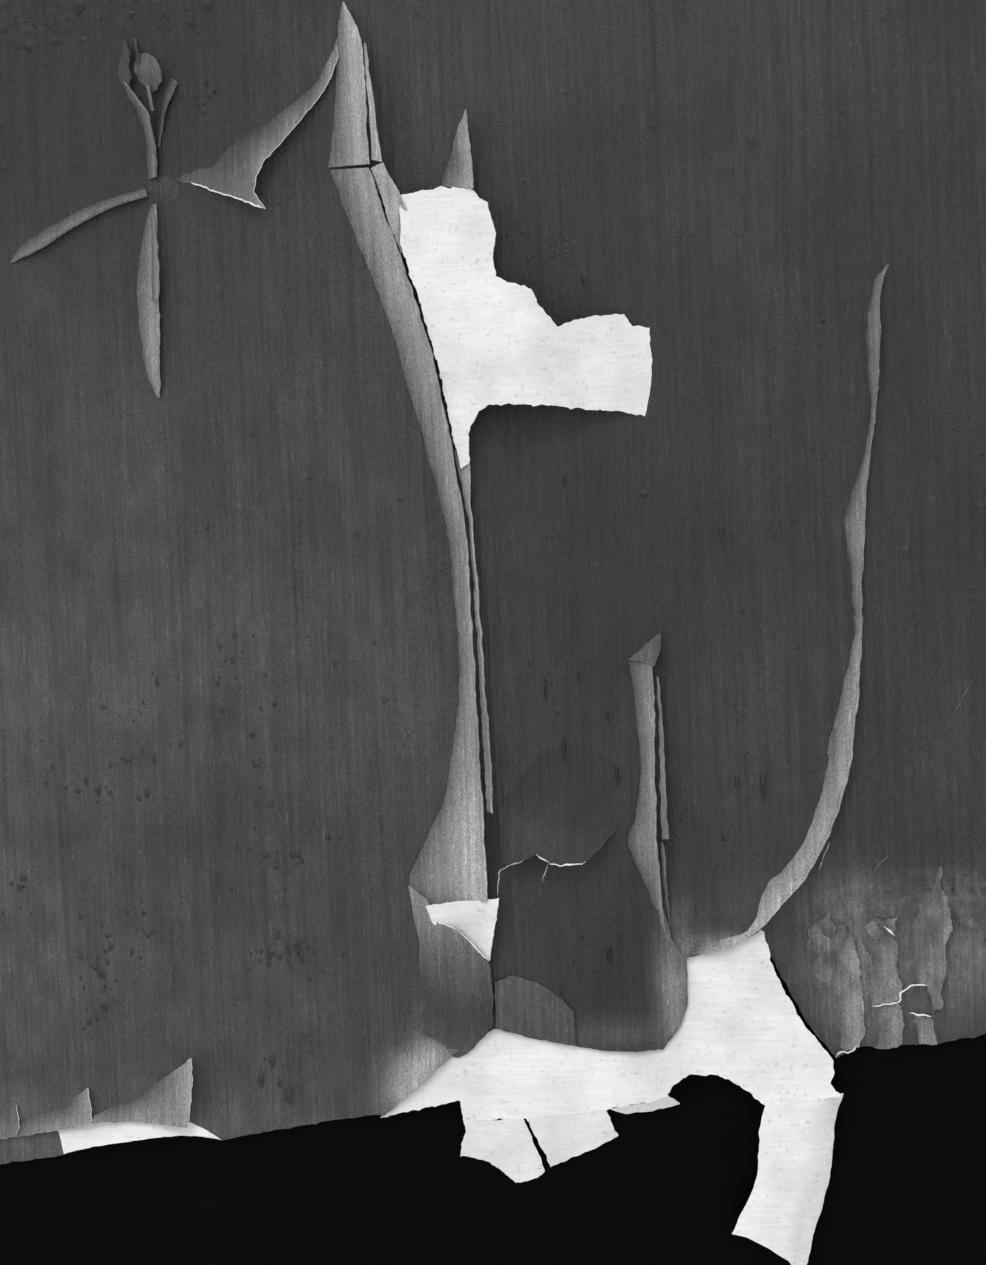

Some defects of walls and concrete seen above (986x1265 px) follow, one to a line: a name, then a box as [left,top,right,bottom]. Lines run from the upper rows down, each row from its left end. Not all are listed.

peeling [10,1,382,398]
peeling [330,109,889,1265]
peeling [0,1058,221,1154]